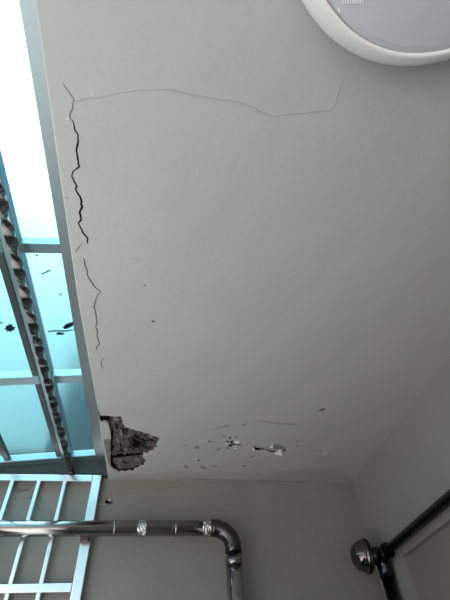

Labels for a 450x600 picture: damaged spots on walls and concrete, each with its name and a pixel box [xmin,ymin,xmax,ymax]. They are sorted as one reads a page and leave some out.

crack [63,80,344,369]
spalling [100,416,159,471]
peeling [252,444,287,457]